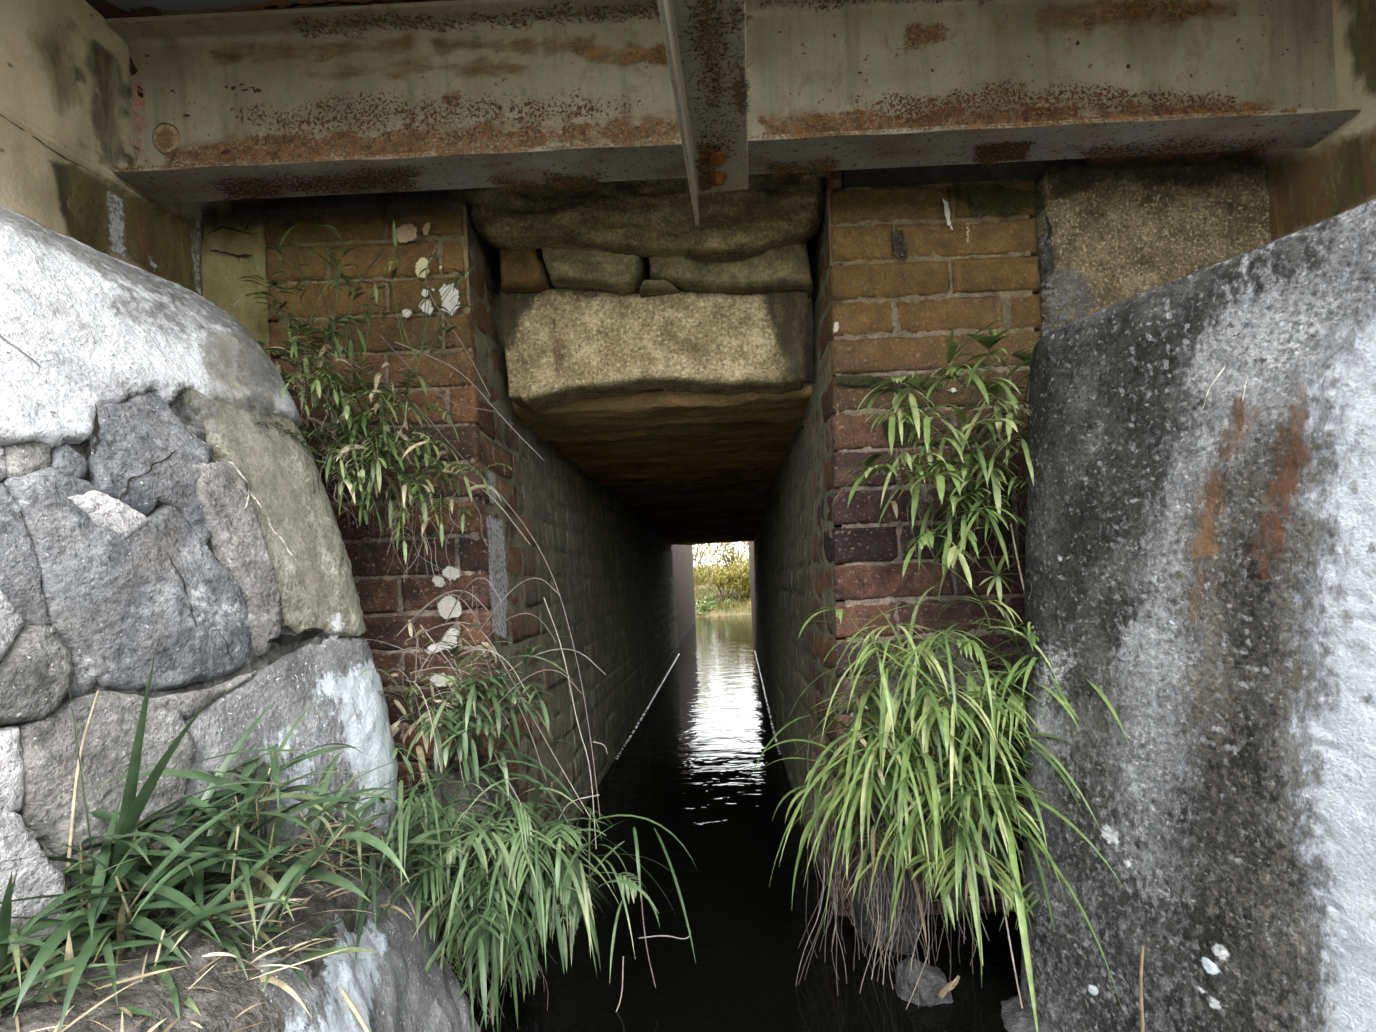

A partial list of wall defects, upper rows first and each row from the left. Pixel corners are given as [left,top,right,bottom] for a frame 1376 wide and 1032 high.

leakage [52,163,76,226]
leakage [76,41,133,167]
rust [112,65,679,204]
rust [276,0,1297,191]
leakage [1341,0,1376,93]
rust [1220,400,1259,458]
rust [1252,404,1309,577]
leakage [1020,127,1376,1032]